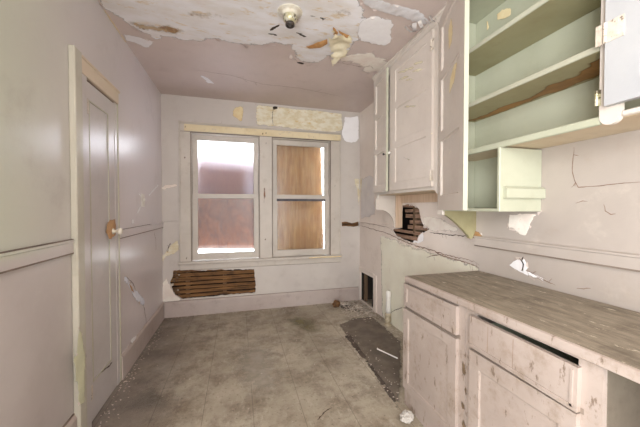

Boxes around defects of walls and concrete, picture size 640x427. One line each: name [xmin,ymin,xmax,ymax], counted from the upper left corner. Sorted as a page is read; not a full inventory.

peeling [99,0,435,74]
peeling [255,104,359,143]
crack [572,154,633,203]
peeling [507,210,542,235]
flaking render [163,269,256,302]
crack [364,224,479,270]
peeling [380,204,478,332]
flaking render [510,257,546,283]